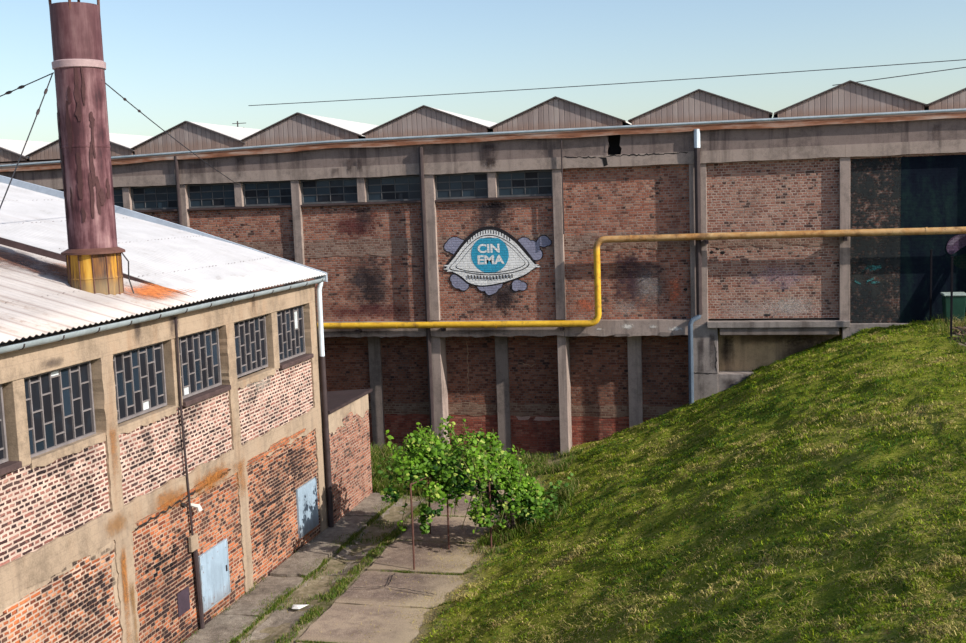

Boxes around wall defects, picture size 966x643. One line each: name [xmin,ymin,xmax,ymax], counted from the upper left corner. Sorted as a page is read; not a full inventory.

spalling [599,135,622,166]
water stain [342,255,398,316]
rust [200,469,224,489]
water stain [255,439,312,562]
water stain [43,556,113,643]
water stain [146,524,226,643]